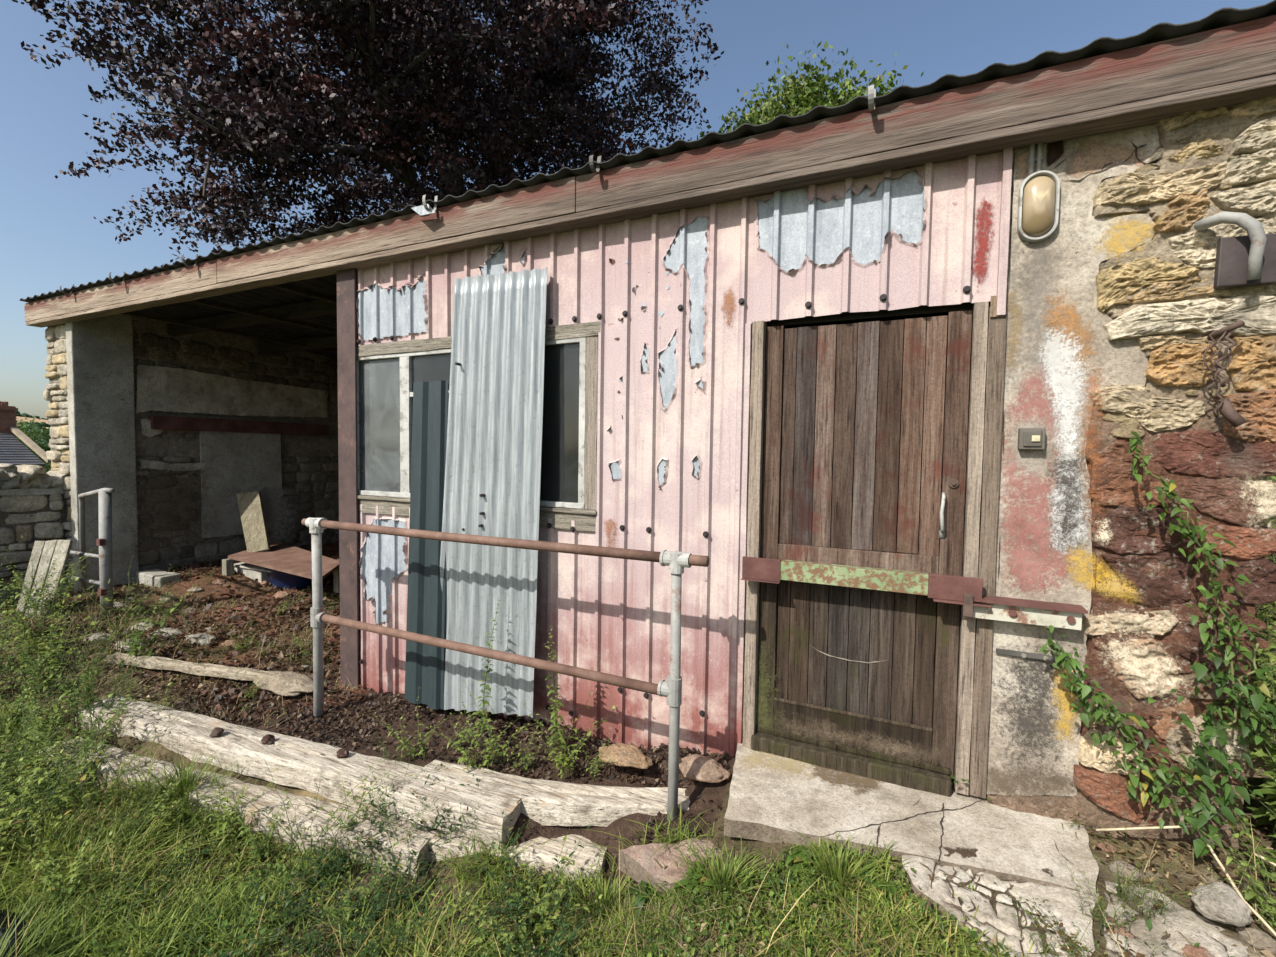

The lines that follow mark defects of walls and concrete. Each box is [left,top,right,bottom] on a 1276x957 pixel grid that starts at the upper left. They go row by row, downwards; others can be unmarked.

peeling [753,168,928,275]
peeling [356,273,429,342]
peeling [639,215,710,413]
peeling [359,517,408,625]
crack [826,798,1056,957]